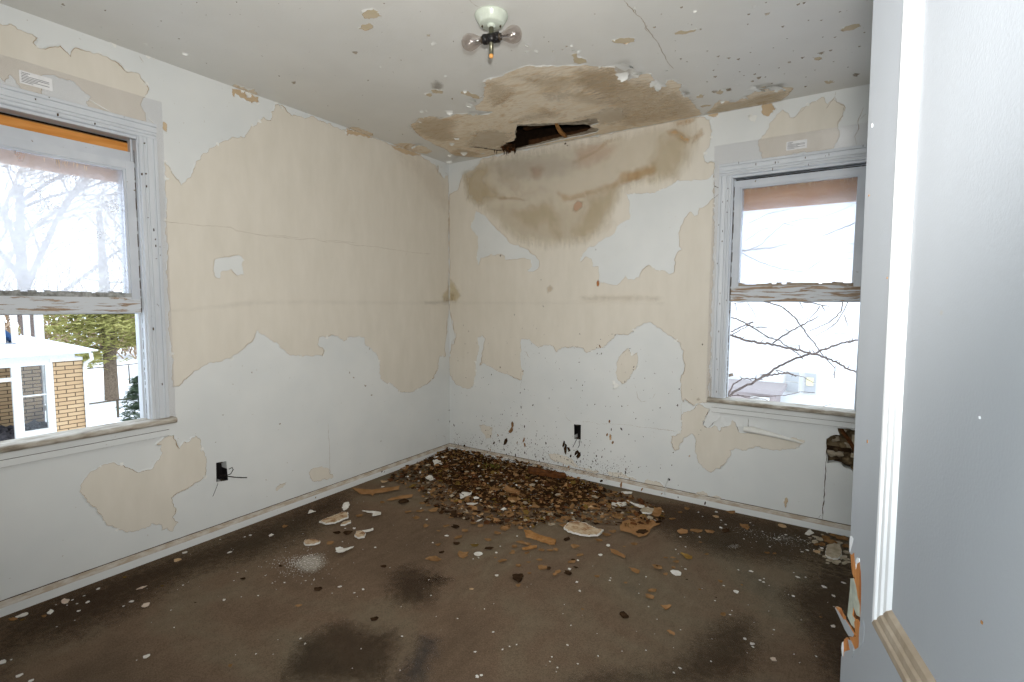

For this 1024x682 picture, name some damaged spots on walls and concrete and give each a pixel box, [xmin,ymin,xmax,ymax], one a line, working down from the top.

peeling [358,3,385,31]
peeling [0,20,150,122]
peeling [163,40,846,473]
peeling [79,434,216,533]
hole [823,425,855,470]